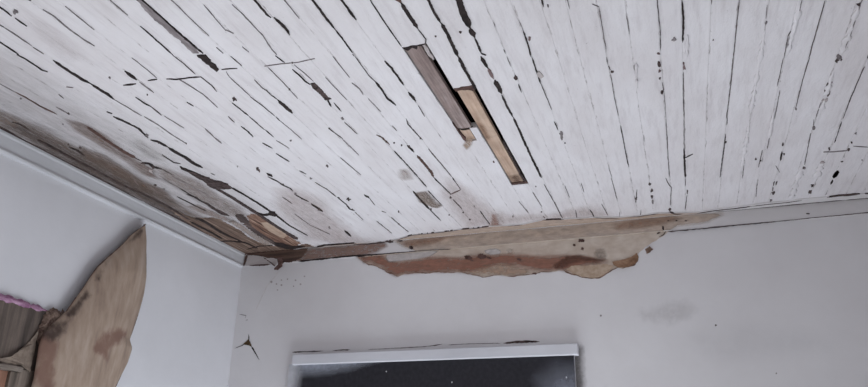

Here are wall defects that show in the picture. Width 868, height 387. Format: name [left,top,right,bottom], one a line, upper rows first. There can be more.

spalling [402,43,434,60]
spalling [452,121,473,149]
spalling [503,138,528,185]
leakage [0,112,271,245]
peeling [417,192,441,208]
peeling [567,264,614,279]